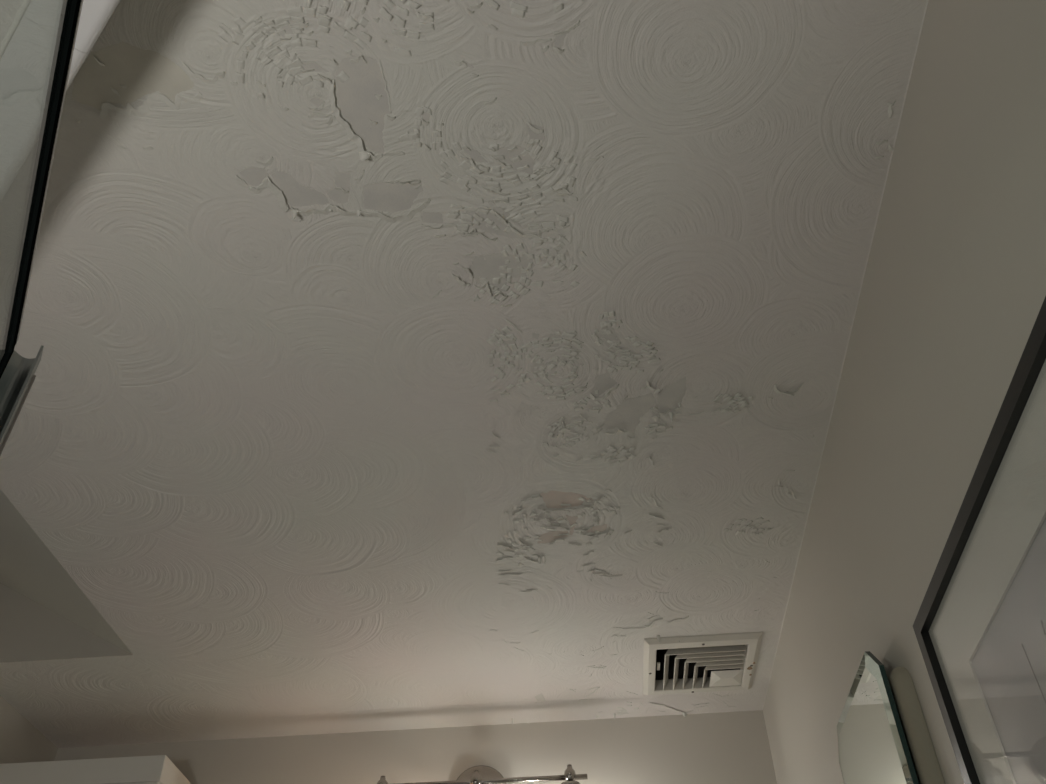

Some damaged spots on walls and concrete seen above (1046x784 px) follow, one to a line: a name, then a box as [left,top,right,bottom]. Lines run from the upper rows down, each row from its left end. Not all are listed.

peeling [71,41,223,119]